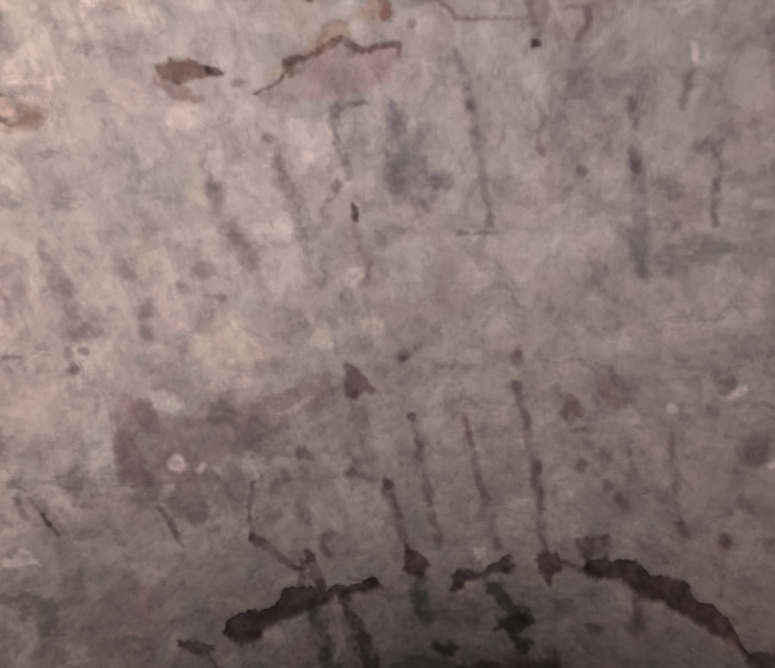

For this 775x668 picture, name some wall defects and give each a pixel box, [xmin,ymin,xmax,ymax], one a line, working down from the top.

peeling [251,11,442,118]
water stain [103,343,576,668]
water stain [552,355,649,519]
water stain [618,585,662,650]
water stain [658,415,696,543]
water stain [712,529,738,602]